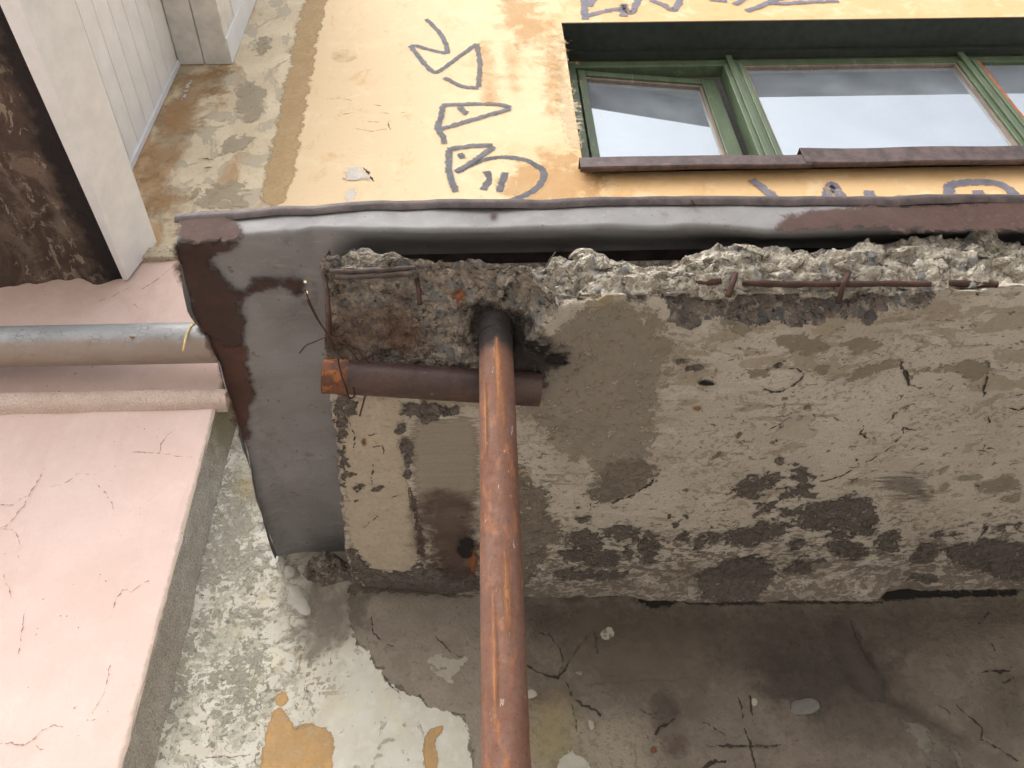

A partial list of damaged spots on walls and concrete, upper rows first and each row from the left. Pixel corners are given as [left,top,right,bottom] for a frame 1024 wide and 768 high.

peeling [218,81,268,156]
rust [775,202,1024,233]
rust [171,210,304,449]
rust [484,337,504,449]
spalling [320,229,1024,604]
crack [763,360,804,393]
crack [820,361,915,482]
crack [977,362,1024,451]
peeling [259,691,334,768]
peeling [303,537,481,768]
rust [492,550,509,712]
crack [527,630,601,731]